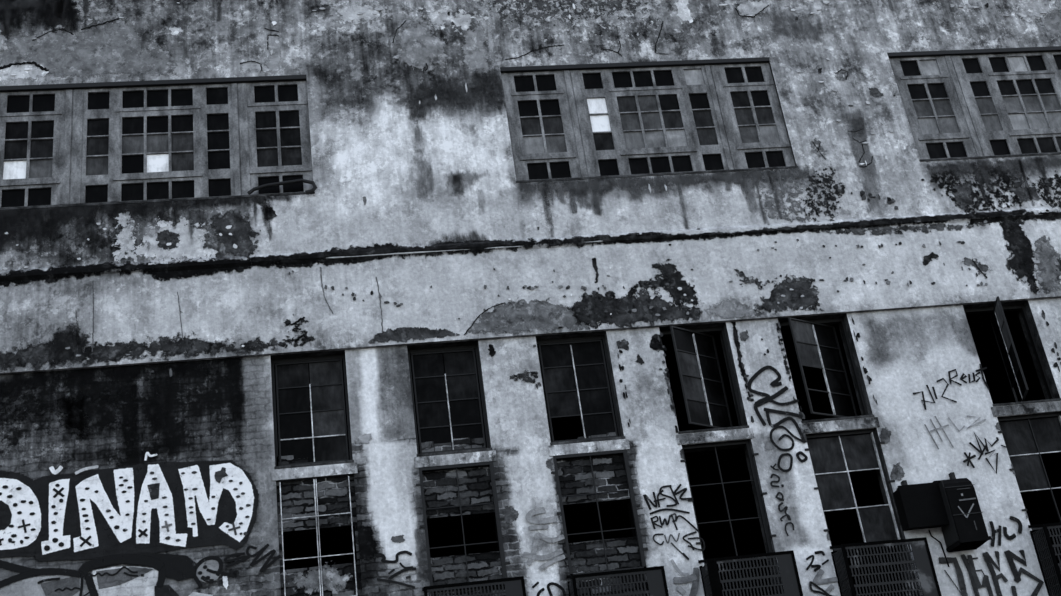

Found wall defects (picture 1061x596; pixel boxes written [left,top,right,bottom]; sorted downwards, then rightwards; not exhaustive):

peeling [0,0,178,84]
peeling [96,209,261,265]
water stain [408,72,506,199]
water stain [0,111,1061,287]
peeling [751,138,1061,294]
water stain [0,314,316,457]
peeling [368,257,825,433]
flaking render [879,427,892,443]